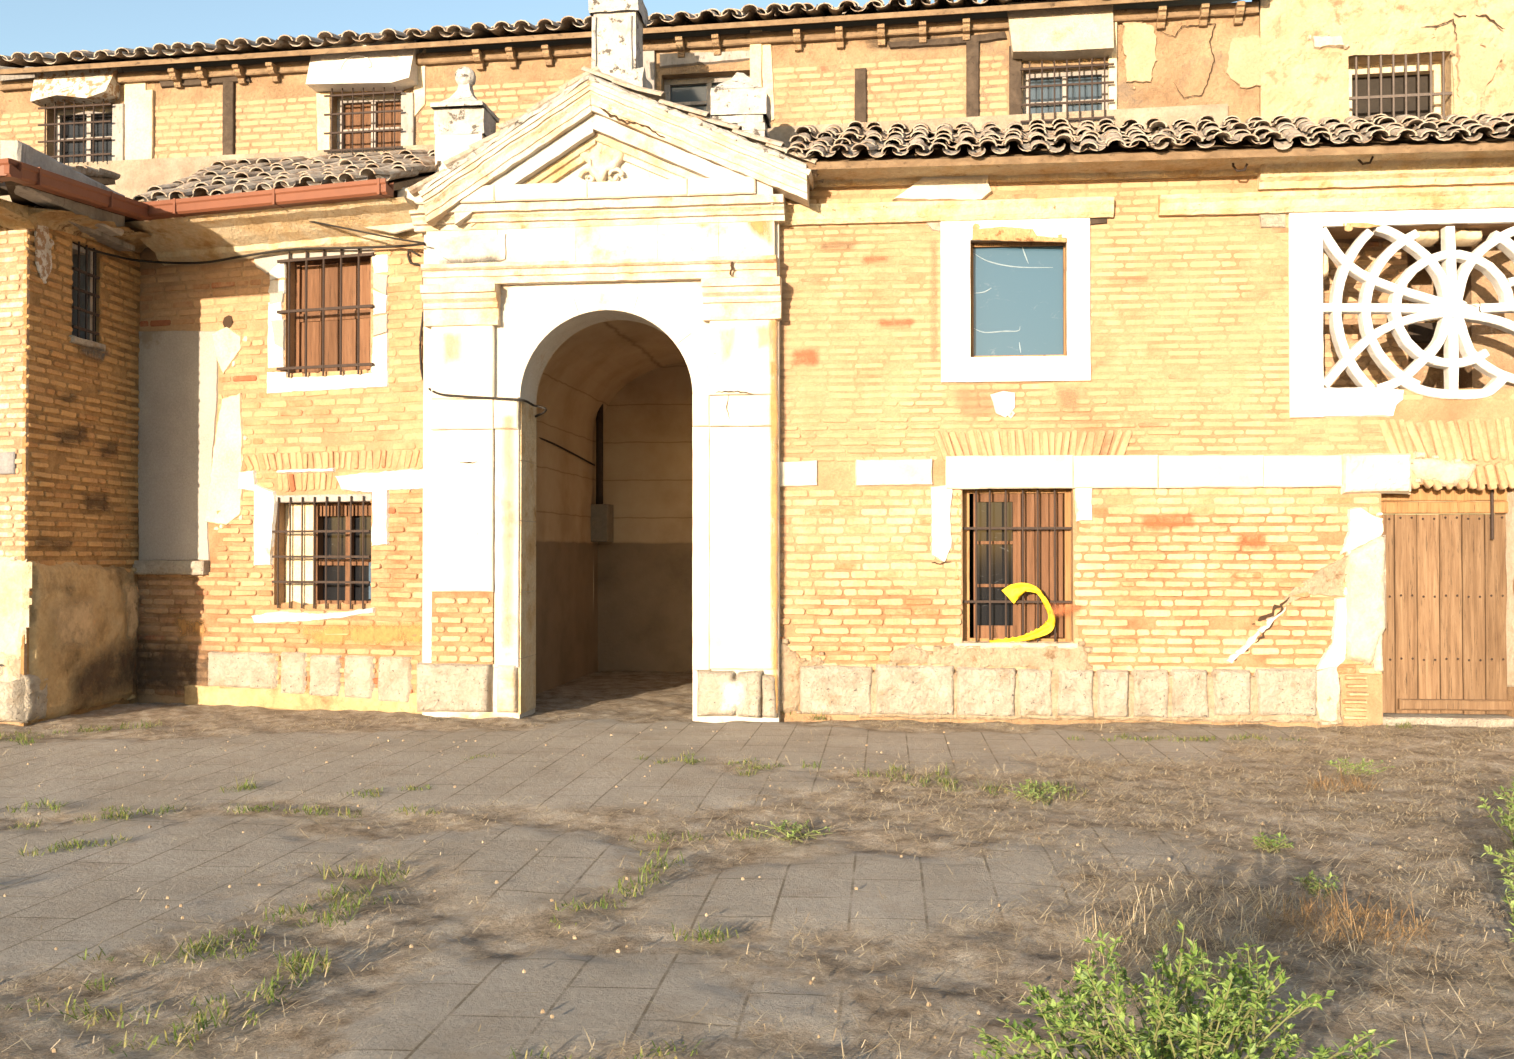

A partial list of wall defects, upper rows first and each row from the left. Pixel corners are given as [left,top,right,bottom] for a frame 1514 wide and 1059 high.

flaking render [1122,21,1157,90]
flaking render [1226,31,1271,89]
leakage [57,602,94,644]
leakage [78,586,208,697]